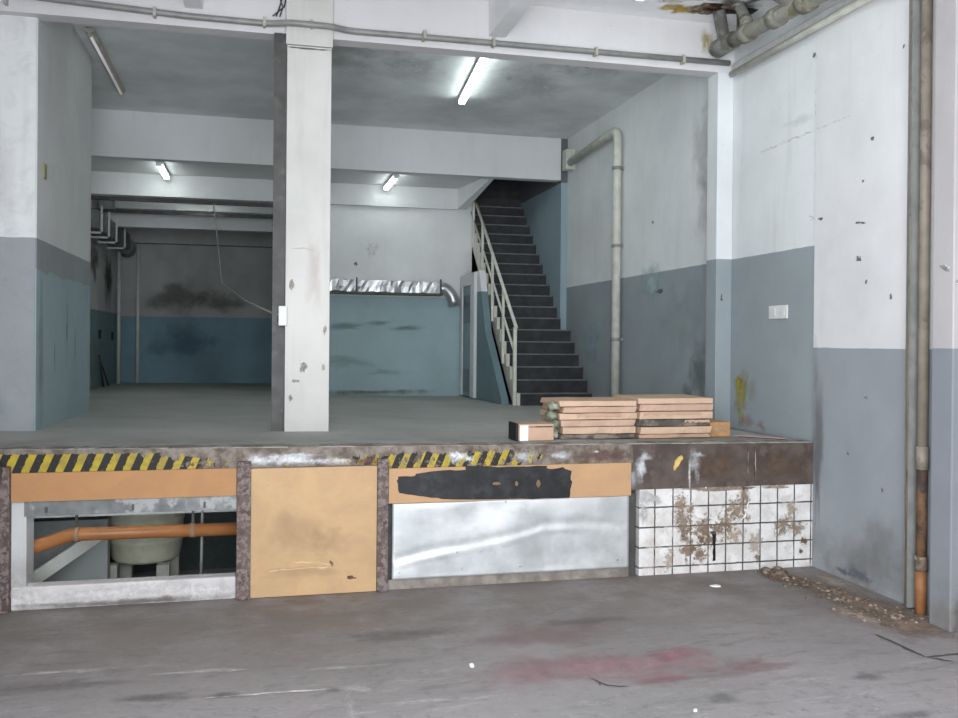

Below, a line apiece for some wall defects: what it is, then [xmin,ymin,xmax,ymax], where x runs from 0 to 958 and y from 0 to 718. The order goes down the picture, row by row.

spalling [693,0,758,15]
crack [875,634,958,662]